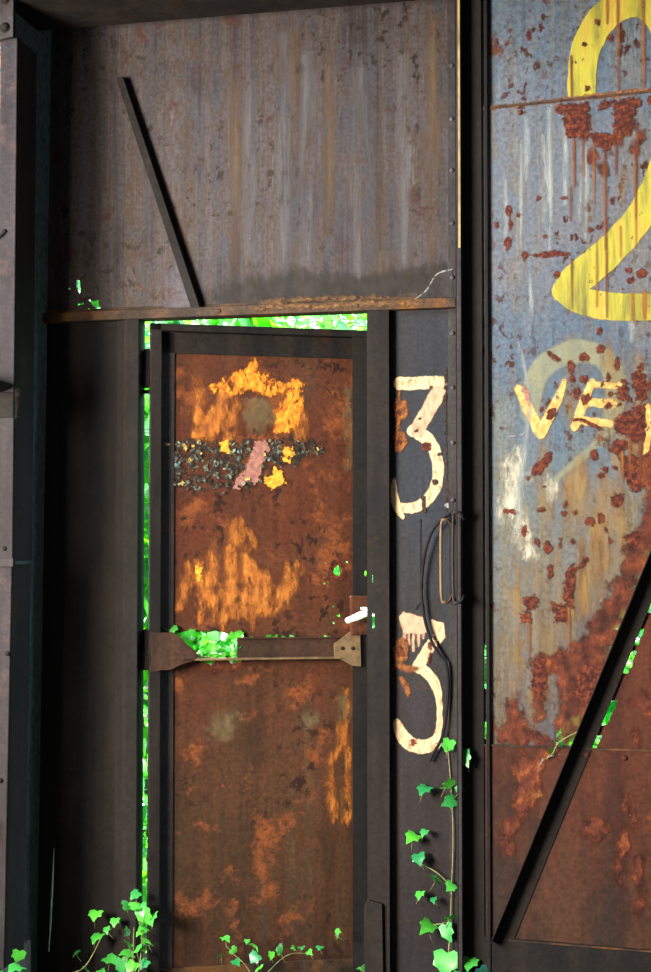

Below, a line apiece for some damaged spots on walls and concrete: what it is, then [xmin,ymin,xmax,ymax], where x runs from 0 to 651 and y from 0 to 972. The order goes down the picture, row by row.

corrosion [493,205,520,251]
corrosion [532,0,651,323]
peeling [162,398,326,495]
corrosion [494,327,651,856]
corrosion [327,688,352,825]